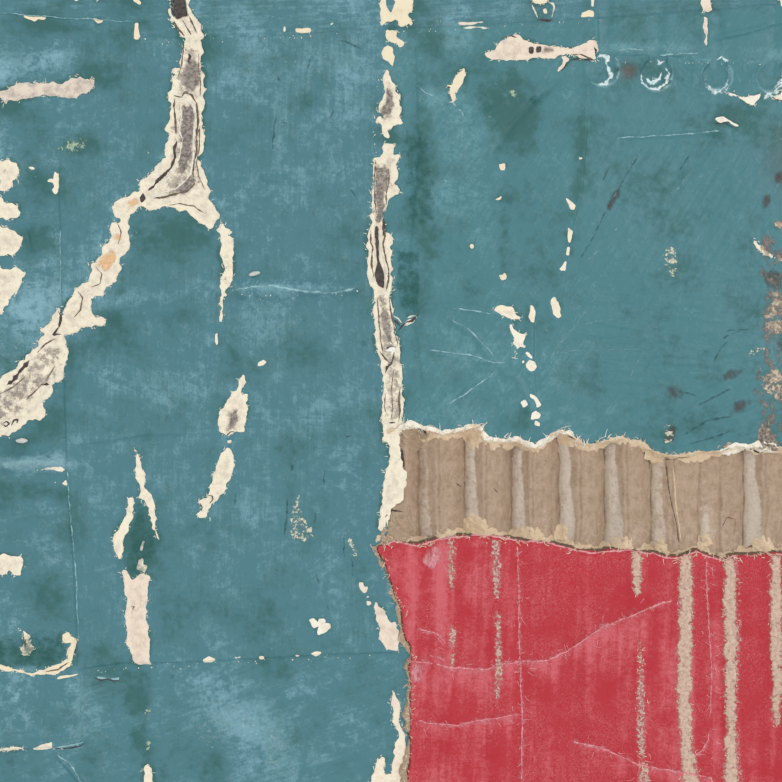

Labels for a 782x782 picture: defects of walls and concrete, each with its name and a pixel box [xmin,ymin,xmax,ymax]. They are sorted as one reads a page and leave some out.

peeling [378,0,414,66]
peeling [485,33,598,71]
peeling [0,74,94,105]
spalling [48,172,59,194]
peeling [0,158,26,314]
peeling [196,375,248,520]
peeling [110,449,159,559]
peeling [119,541,152,665]
peeling [0,628,78,679]
peeling [143,764,155,782]